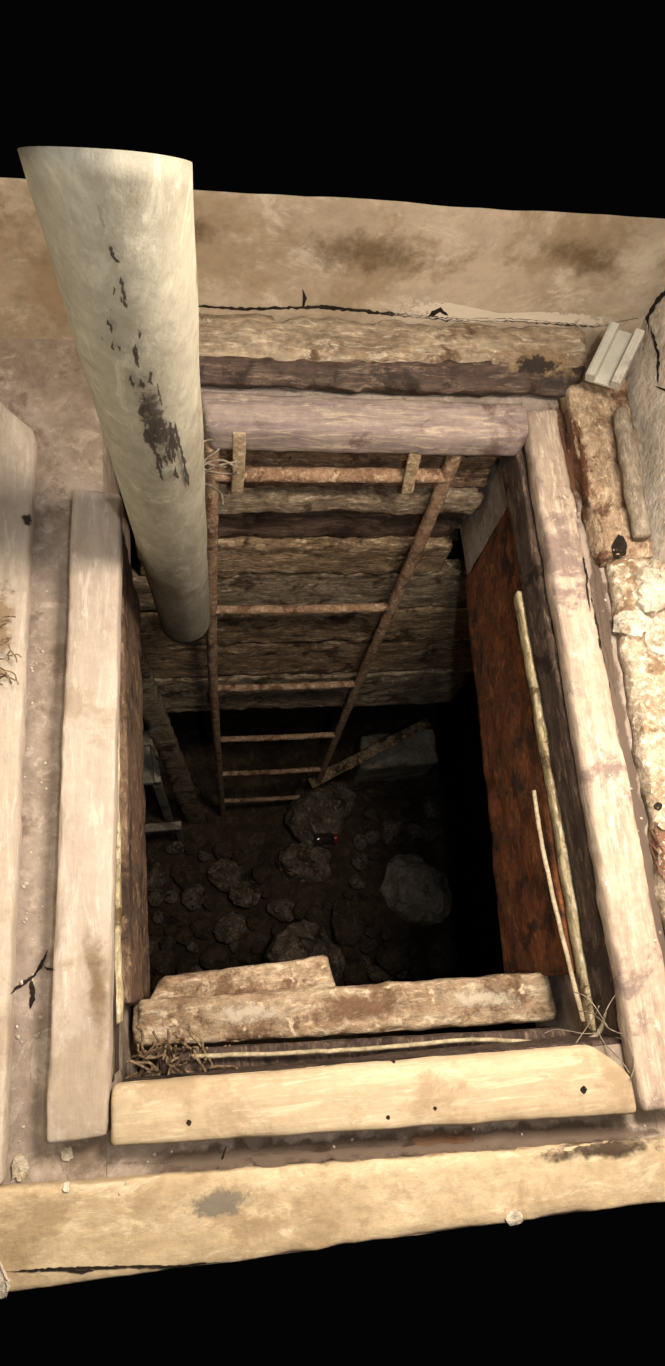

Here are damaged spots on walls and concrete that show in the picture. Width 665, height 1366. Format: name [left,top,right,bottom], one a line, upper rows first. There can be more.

crack [198,289,665,391]
crack [10,950,55,1009]
water stain [152,1115,658,1170]
water stain [194,1191,245,1217]
crack [7,1262,220,1274]